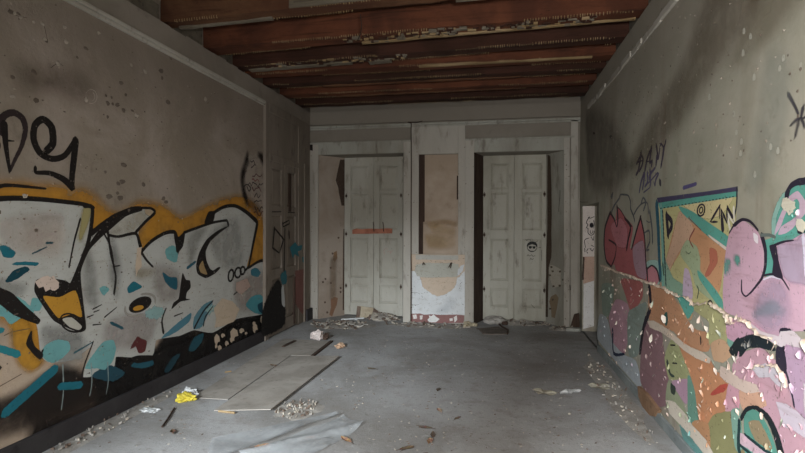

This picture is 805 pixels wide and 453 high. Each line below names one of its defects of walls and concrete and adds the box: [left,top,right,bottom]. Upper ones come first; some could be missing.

peeling [600,264,805,453]